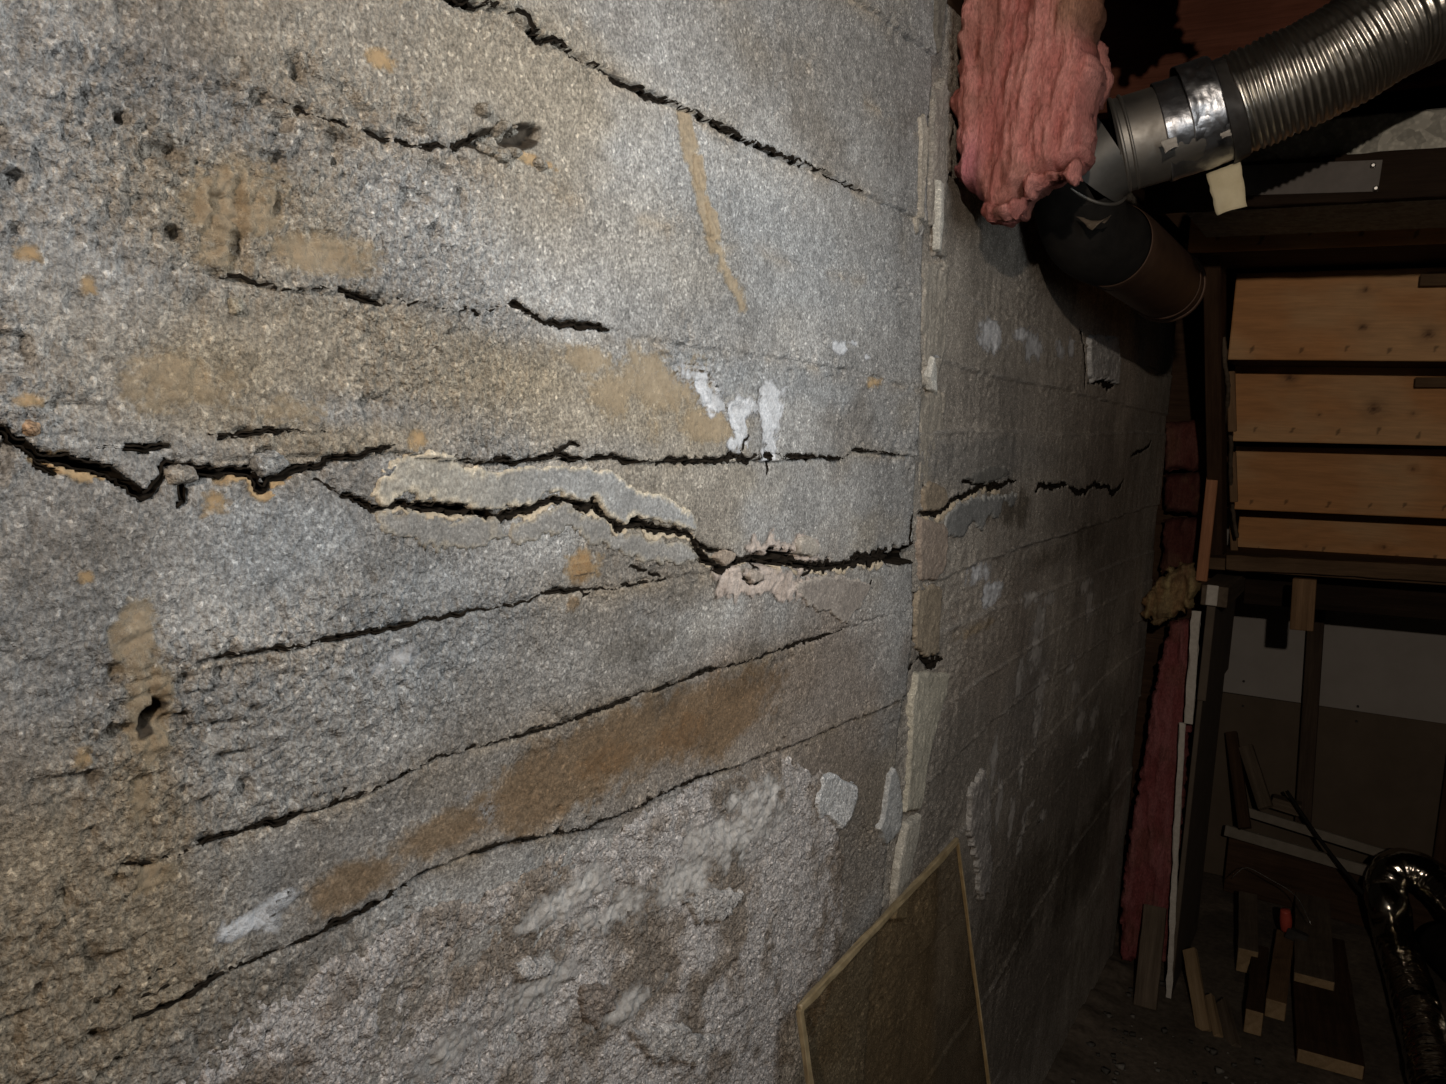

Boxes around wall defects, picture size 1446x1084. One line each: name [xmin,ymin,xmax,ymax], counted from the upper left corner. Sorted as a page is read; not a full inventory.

crack [276,98,478,152]
crack [448,0,863,191]
water stain [567,347,787,462]
crack [0,424,1152,658]
flaking render [370,449,820,604]
crack [120,629,842,865]
peeling [815,772,858,829]
crack [133,869,429,1019]